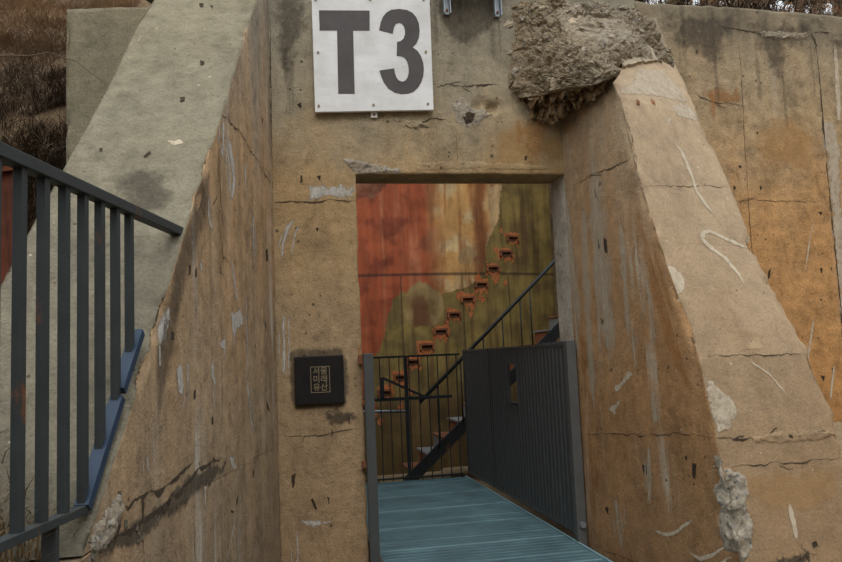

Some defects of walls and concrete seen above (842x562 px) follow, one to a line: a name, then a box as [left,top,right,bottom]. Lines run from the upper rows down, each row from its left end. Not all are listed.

crack [223,4,349,225]
crack [439,81,497,92]
spalling [504,0,698,125]
peeling [310,184,353,199]
crack [644,25,842,324]
peeling [823,44,842,311]
spalling [88,457,236,562]
crack [107,457,222,548]
crack [587,428,826,441]
spalling [706,381,737,432]
spalling [713,455,753,562]
crack [734,457,840,470]